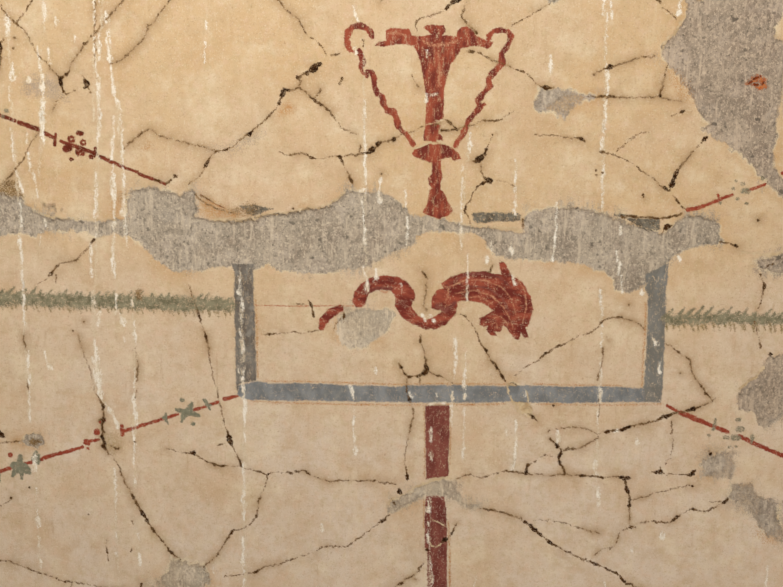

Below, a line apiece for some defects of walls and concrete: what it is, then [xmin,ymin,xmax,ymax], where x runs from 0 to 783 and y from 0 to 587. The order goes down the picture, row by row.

damp [0,1,70,336]
crack [0,0,170,108]
damp [88,0,143,584]
crack [166,286,453,577]
crack [124,0,515,222]
flaking render [0,177,724,294]
flaking render [329,299,396,358]
flaking render [384,476,490,516]
crack [454,304,729,587]
crack [534,132,708,235]
flaking render [653,0,783,200]
flaking render [735,354,783,434]